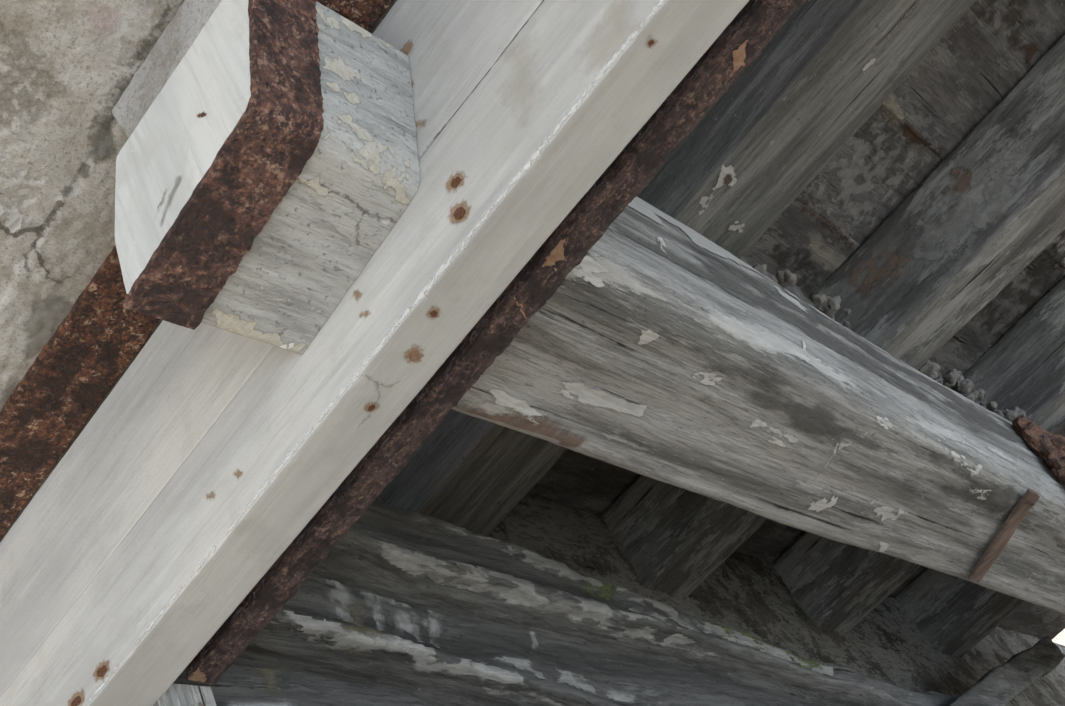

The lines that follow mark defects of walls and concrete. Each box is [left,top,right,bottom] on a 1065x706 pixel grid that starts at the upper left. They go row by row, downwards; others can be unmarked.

rust [732,40,748,73]
rust [446,173,464,190]
rust [712,164,737,190]
rust [450,201,469,223]
crack [0,201,69,284]
rust [542,239,566,271]
rust [405,347,423,362]
peeling [618,194,1028,514]
peeling [870,499,908,521]
rust [93,661,109,681]
rust [188,663,206,683]
rust [68,690,84,706]